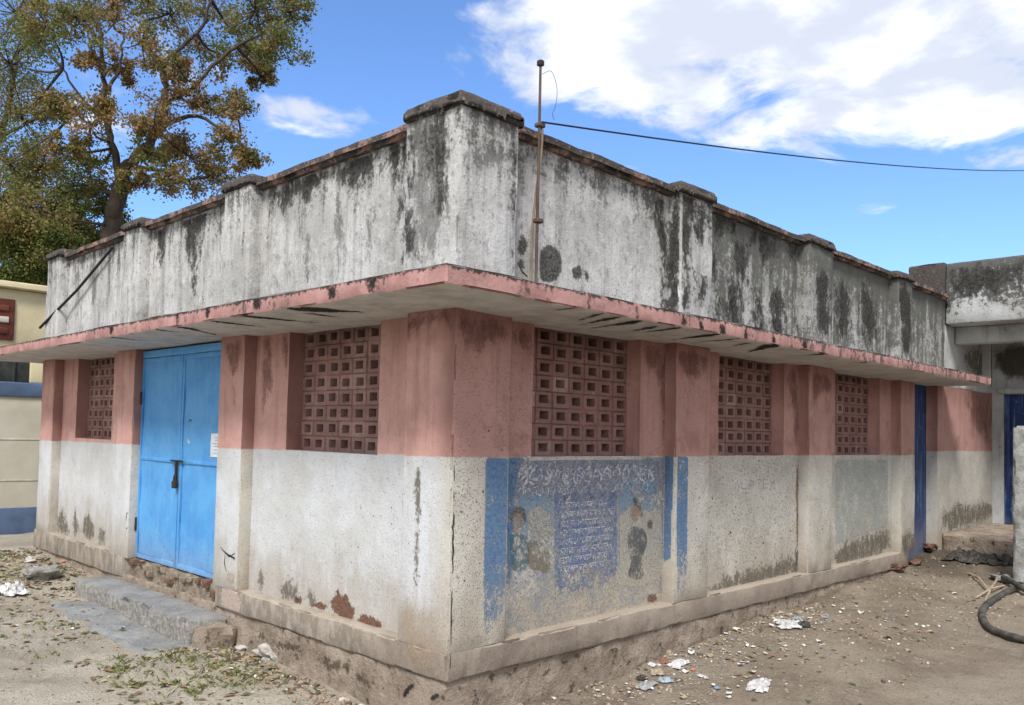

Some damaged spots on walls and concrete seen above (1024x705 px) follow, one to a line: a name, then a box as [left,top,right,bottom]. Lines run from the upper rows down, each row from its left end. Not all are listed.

damp [272,169,327,213]
damp [339,154,374,189]
damp [154,228,166,265]
damp [183,213,211,295]
damp [631,184,799,352]
mould [950,261,1024,306]
mould [816,268,878,347]
damp [899,281,913,353]
damp [57,510,105,544]
damp [834,530,915,564]
damp [711,550,798,591]
spalling [294,590,382,627]